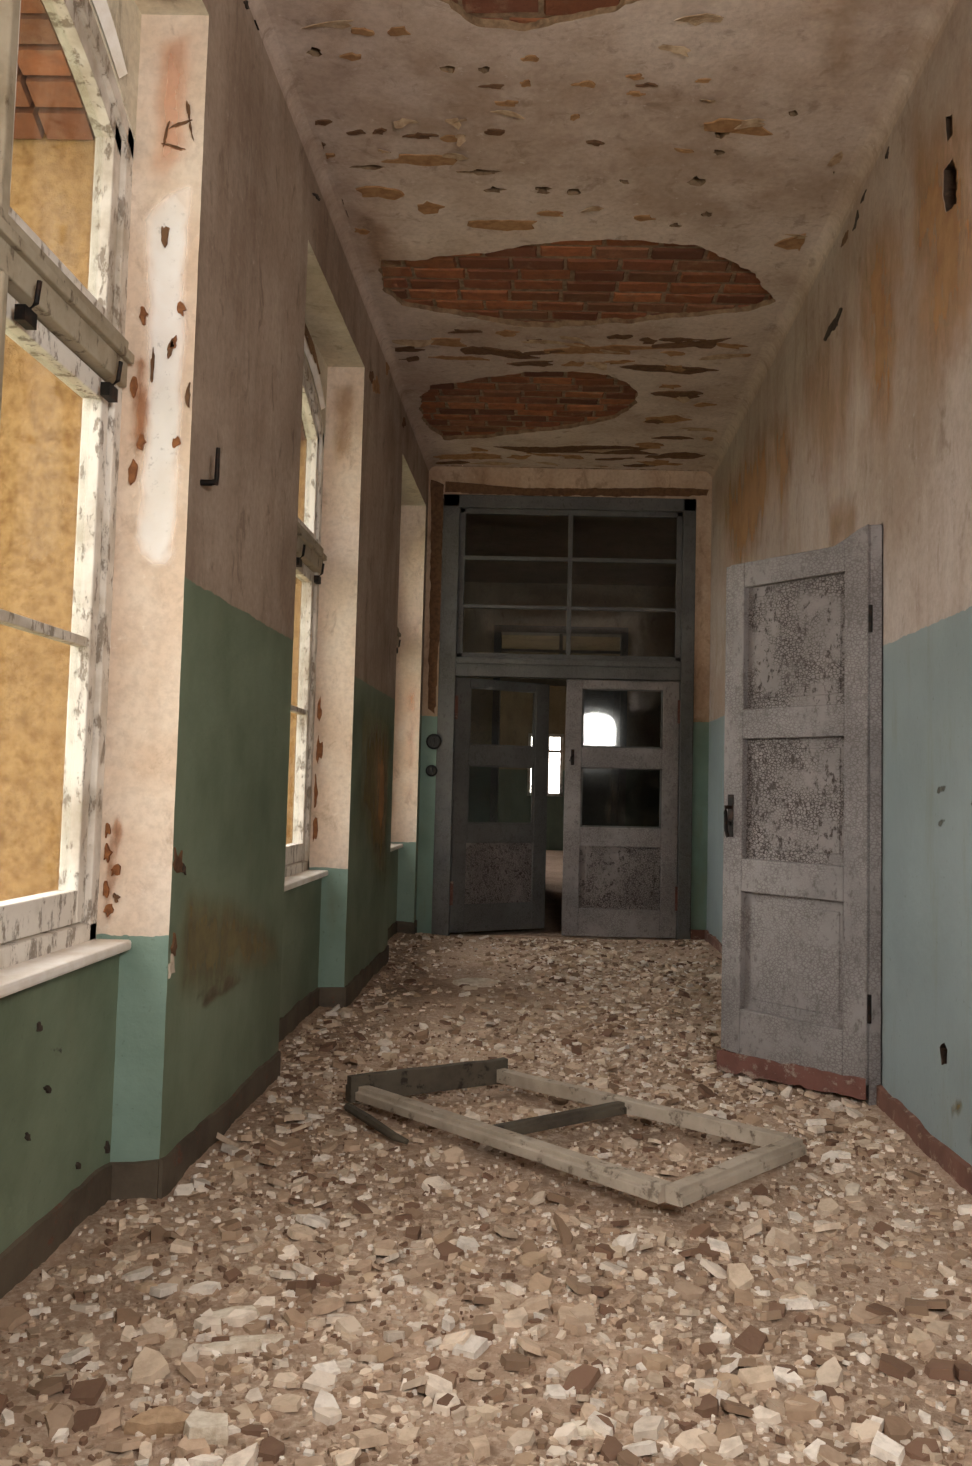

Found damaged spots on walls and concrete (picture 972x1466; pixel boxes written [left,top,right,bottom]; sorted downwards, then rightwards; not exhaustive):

flaking render [307,47,361,61]
flaking render [302,20,411,36]
flaking render [440,0,640,31]
flaking render [675,13,724,26]
flaking render [478,66,531,136]
flaking render [695,78,773,156]
spalling [945,115,953,142]
flaking render [315,118,506,235]
spalling [943,159,957,212]
flaking render [774,233,808,251]
peeling [139,190,188,561]
flaking render [369,187,776,714]